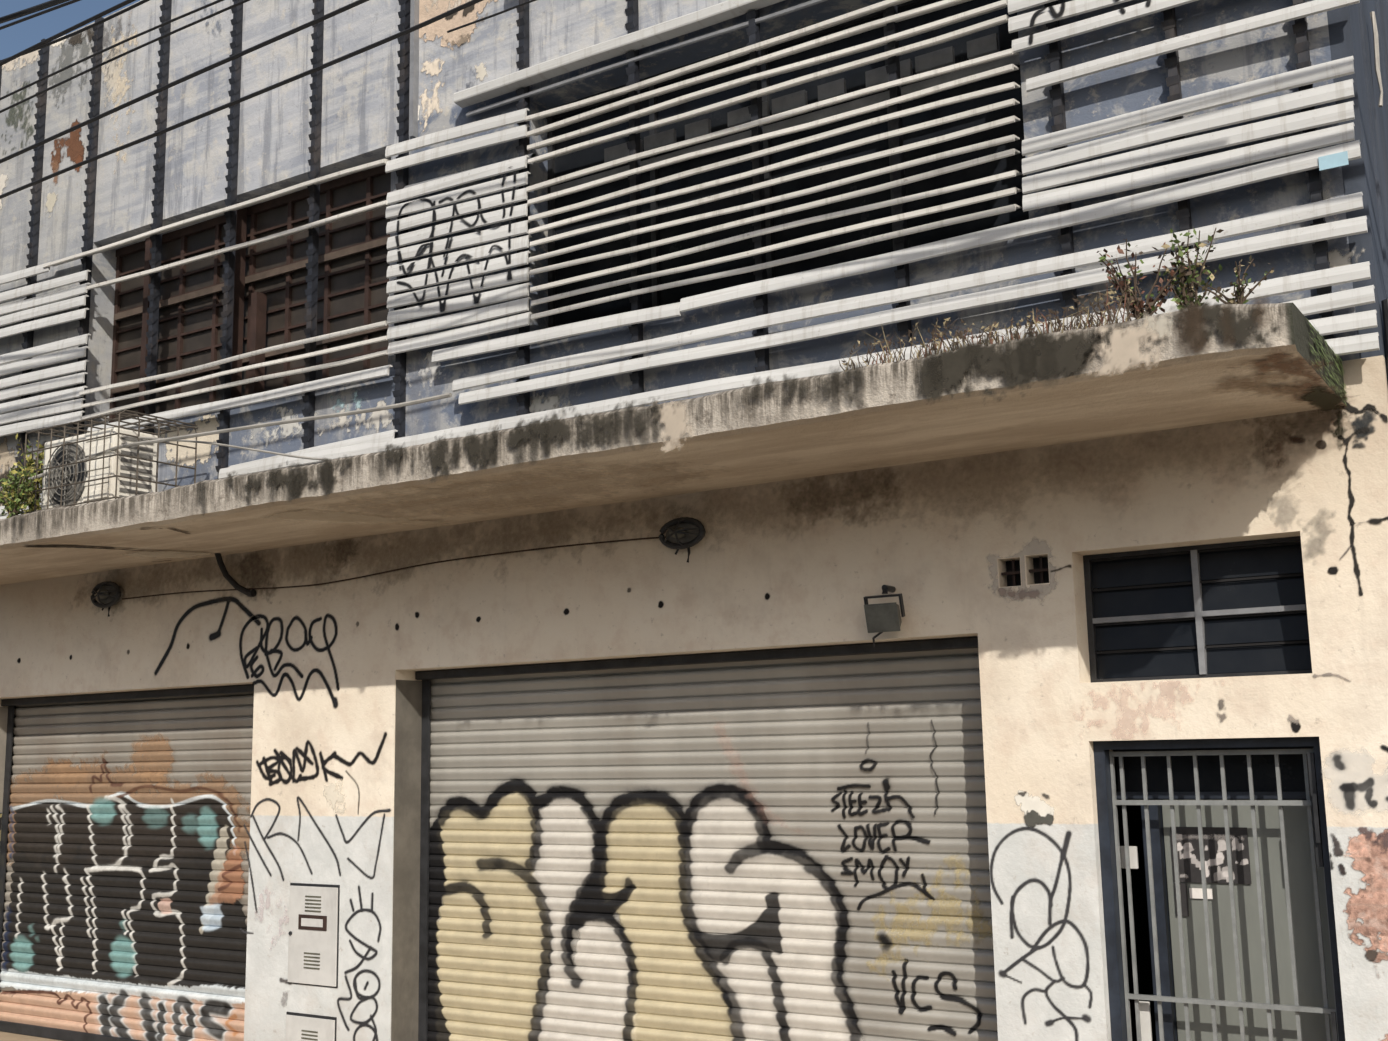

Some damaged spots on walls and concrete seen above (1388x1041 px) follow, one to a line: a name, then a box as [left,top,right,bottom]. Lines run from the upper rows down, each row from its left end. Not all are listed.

peeling [2,35,67,71]
peeling [102,29,137,117]
flaking render [418,0,498,131]
corrosion [51,119,85,183]
water stain [1175,298,1280,350]
water stain [743,367,862,405]
water stain [916,330,1104,401]
water stain [385,402,659,482]
water stain [227,458,351,504]
crack [1338,402,1388,596]
peeling [1015,790,1054,827]
flaking render [1330,827,1388,963]